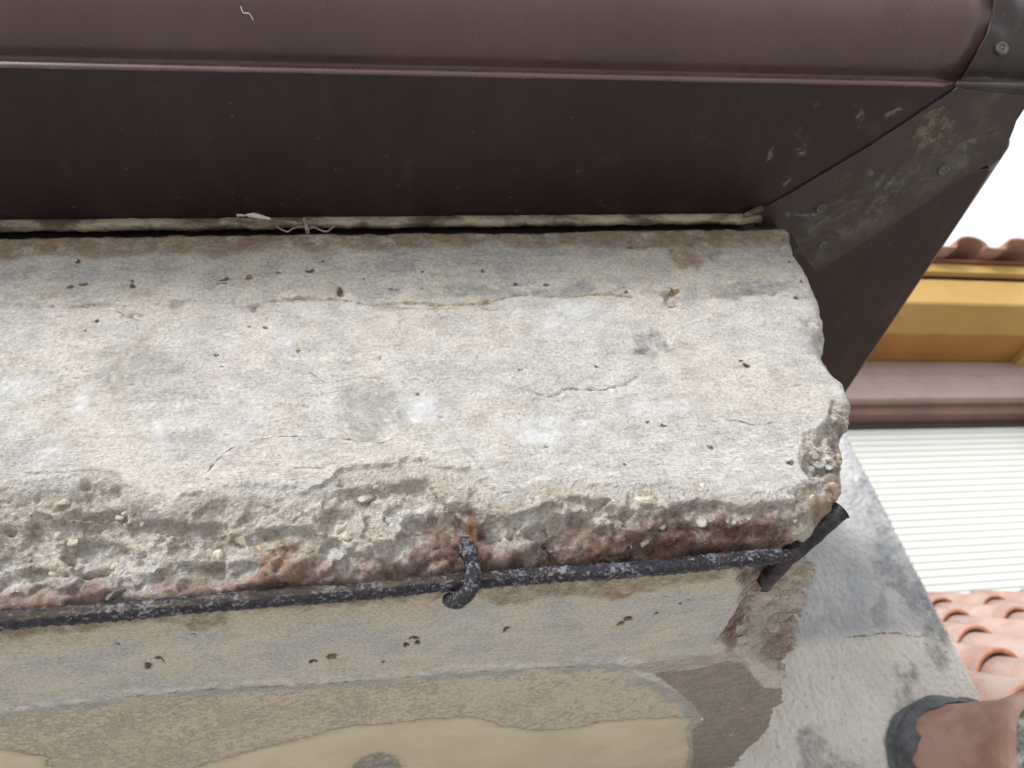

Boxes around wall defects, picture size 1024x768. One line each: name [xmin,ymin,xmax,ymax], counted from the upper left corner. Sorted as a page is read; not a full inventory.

crack [246,286,632,311]
rust [0,504,792,638]
spalling [0,398,851,701]